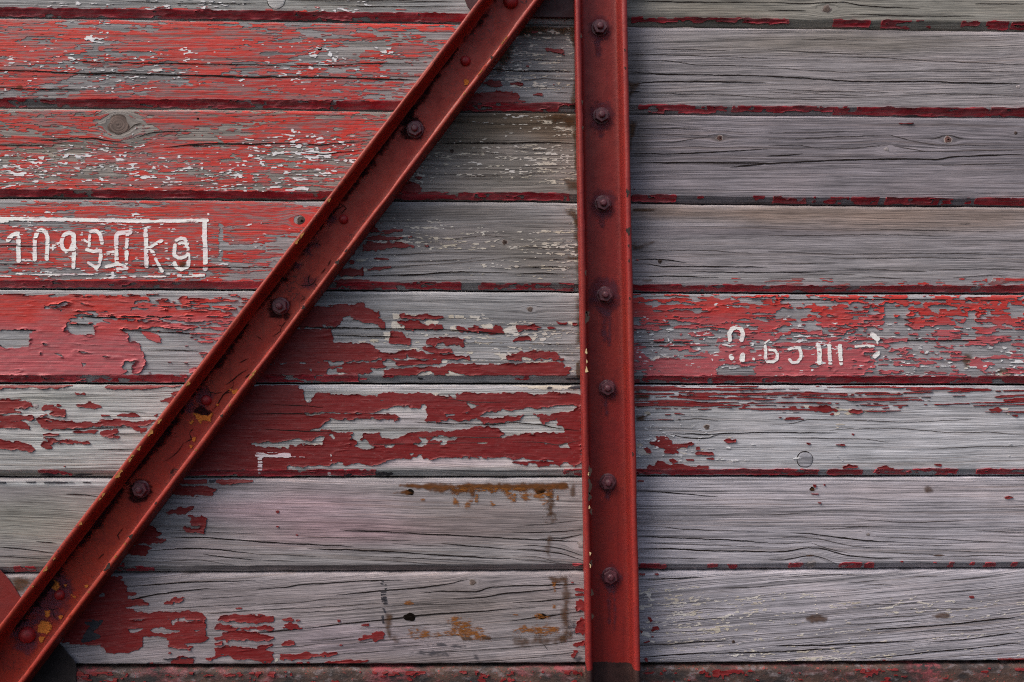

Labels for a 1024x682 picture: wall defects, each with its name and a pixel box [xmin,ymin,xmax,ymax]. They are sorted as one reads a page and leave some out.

peeling [462,79,576,112]
peeling [0,6,467,452]
corrosion [256,48,459,320]
peeling [395,176,570,201]
peeling [166,226,582,534]
peeling [633,278,1024,420]
peeling [38,466,72,476]
corrosion [13,324,248,652]
corrosion [399,482,575,515]
peeling [62,525,426,682]
peeling [562,582,585,682]
peeling [688,669,759,681]